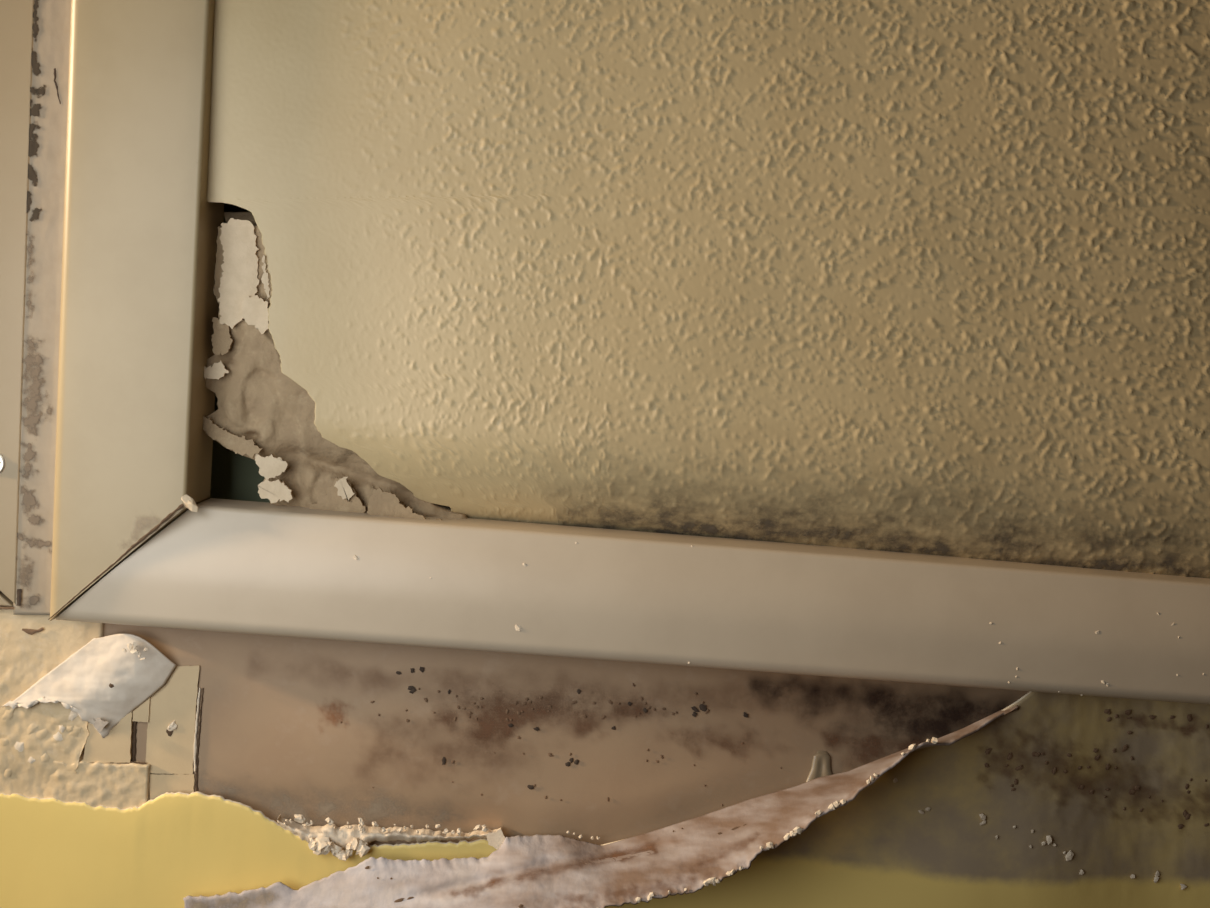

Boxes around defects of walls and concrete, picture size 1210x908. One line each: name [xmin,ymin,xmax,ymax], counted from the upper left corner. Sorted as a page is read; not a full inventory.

flaking render [203,203,468,521]
peeling [2,634,200,800]
leakage [396,667,677,755]
leakage [691,692,709,717]
leakage [752,680,1005,751]
peeling [183,705,1019,908]
peeling [1029,830,1084,875]